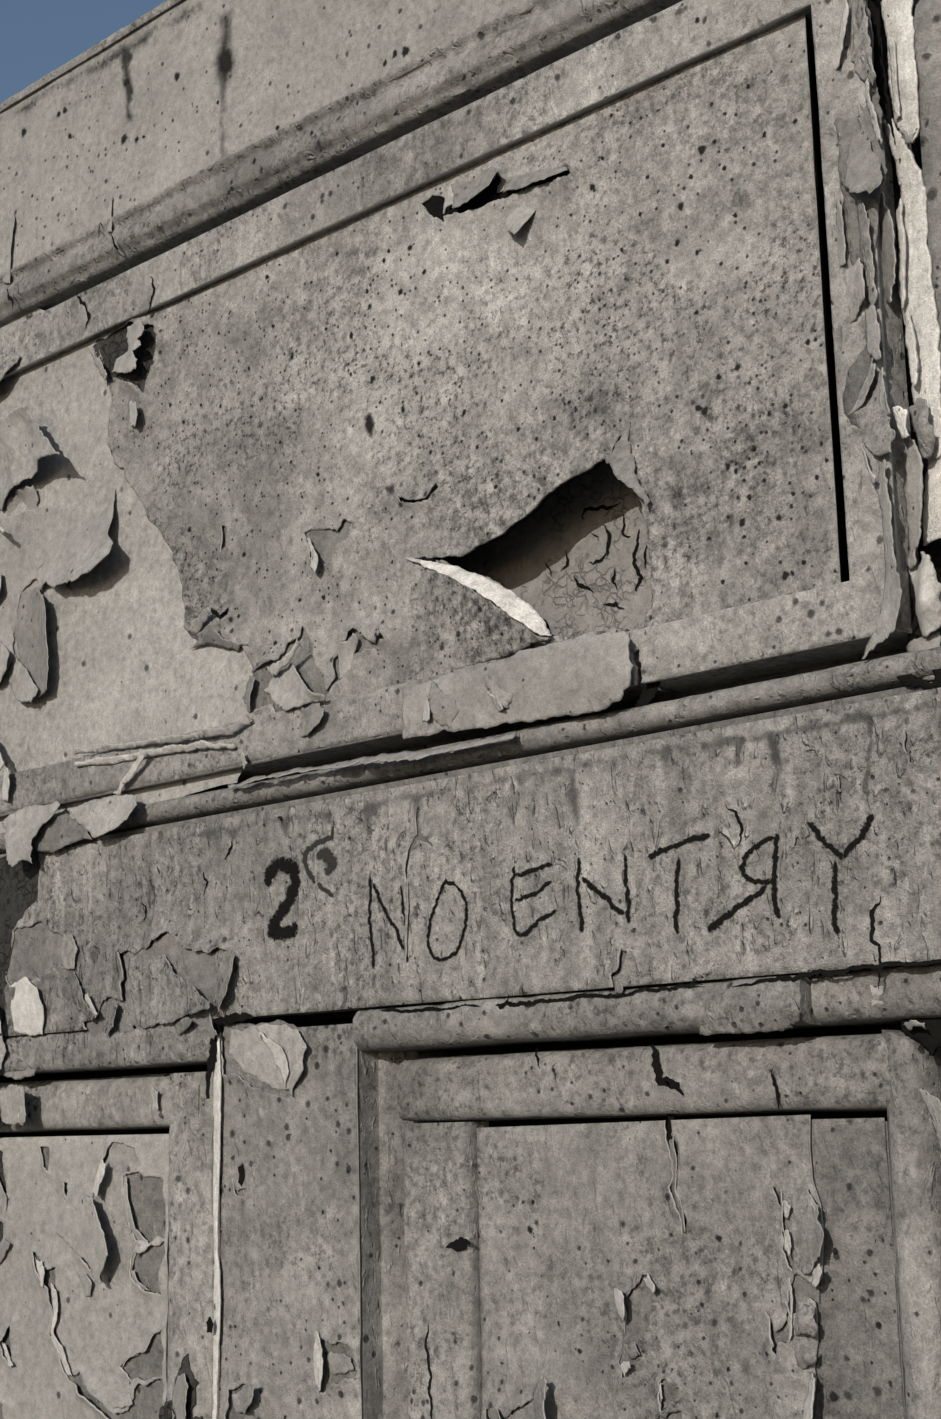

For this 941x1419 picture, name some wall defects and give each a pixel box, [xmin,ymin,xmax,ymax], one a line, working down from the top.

peeling [423,166,570,235]
peeling [0,308,45,333]
peeling [834,0,941,660]
spalling [896,669,941,690]
peeling [0,320,634,1419]
crack [650,1044,687,1234]
peeling [614,1273,655,1377]
peeling [773,1187,824,1419]
peeling [657,1379,682,1419]